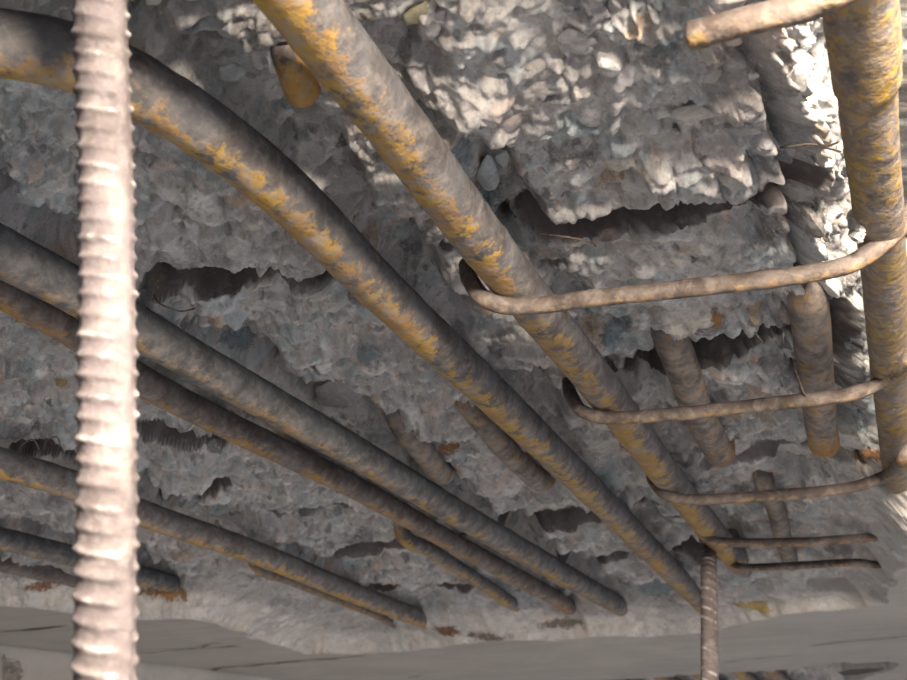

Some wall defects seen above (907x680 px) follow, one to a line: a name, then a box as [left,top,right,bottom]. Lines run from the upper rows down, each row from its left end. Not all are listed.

spalling [127,0,907,591]
corrosion [712,308,725,329]
spalling [0,0,140,680]
corrosion [440,443,460,455]
corrosion [849,448,881,466]
spalling [616,466,907,680]
corrosion [139,588,187,603]